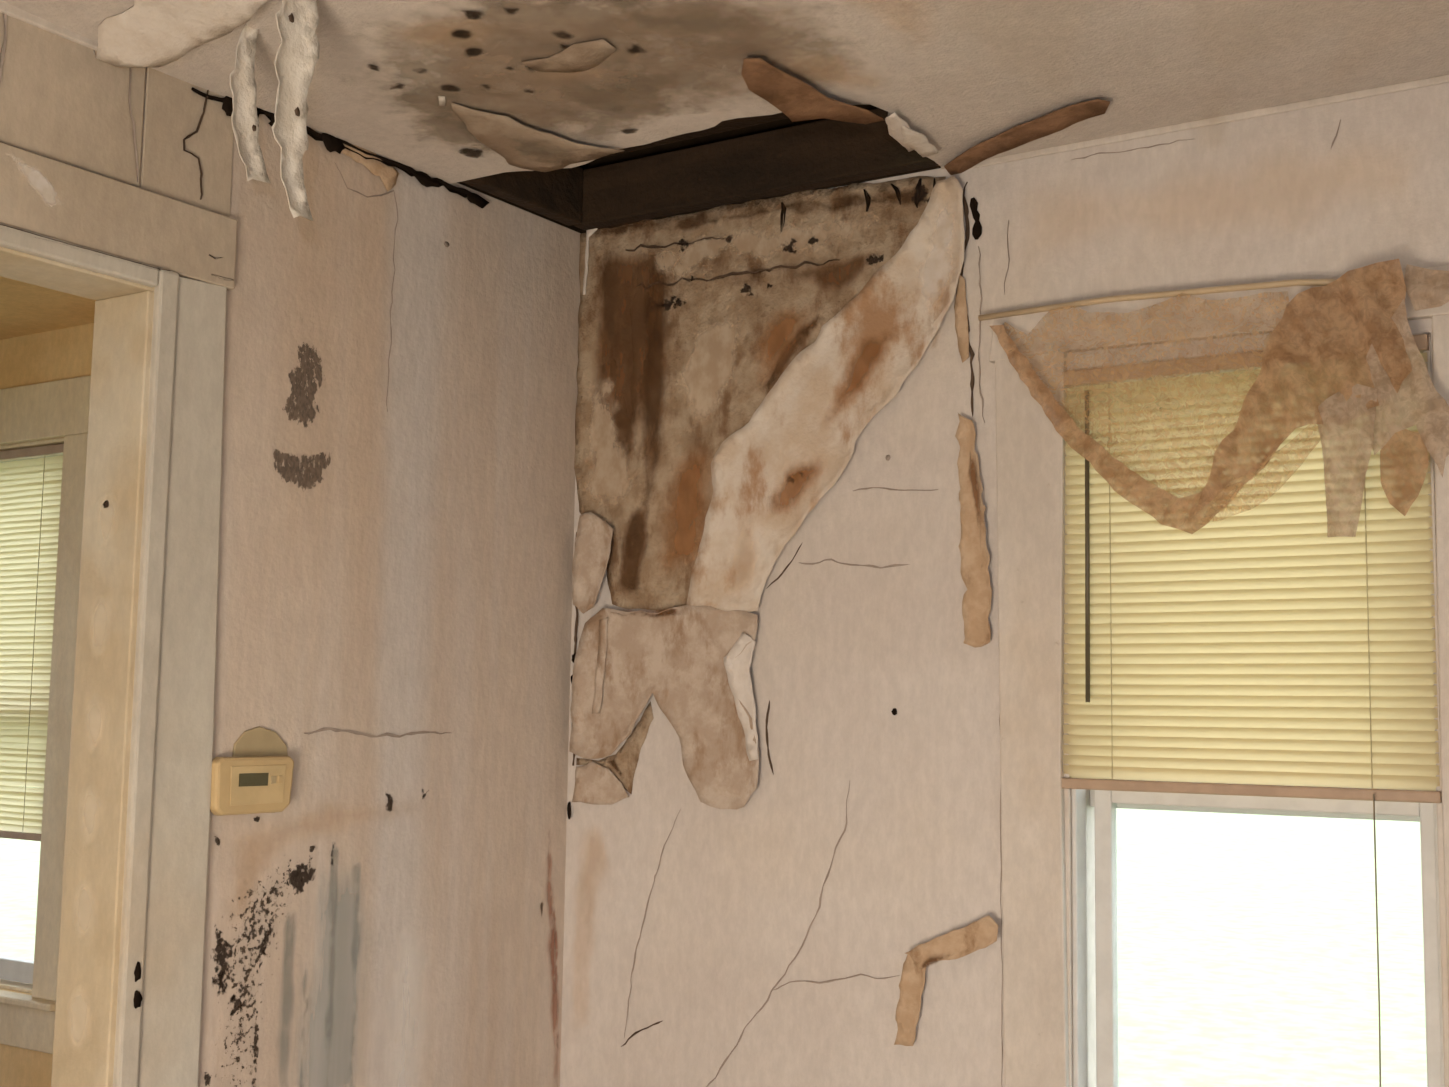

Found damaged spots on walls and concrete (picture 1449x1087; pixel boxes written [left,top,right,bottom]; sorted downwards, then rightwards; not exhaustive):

peeling [230,0,320,221]
peeling [438,96,624,172]
leakage [391,0,831,158]
spalling [574,58,1110,714]
peeling [723,632,759,761]
mould [204,845,334,1087]
crack [621,809,681,1047]
crack [706,781,900,1087]
peeling [894,915,998,1046]
crack [997,789,1005,1085]